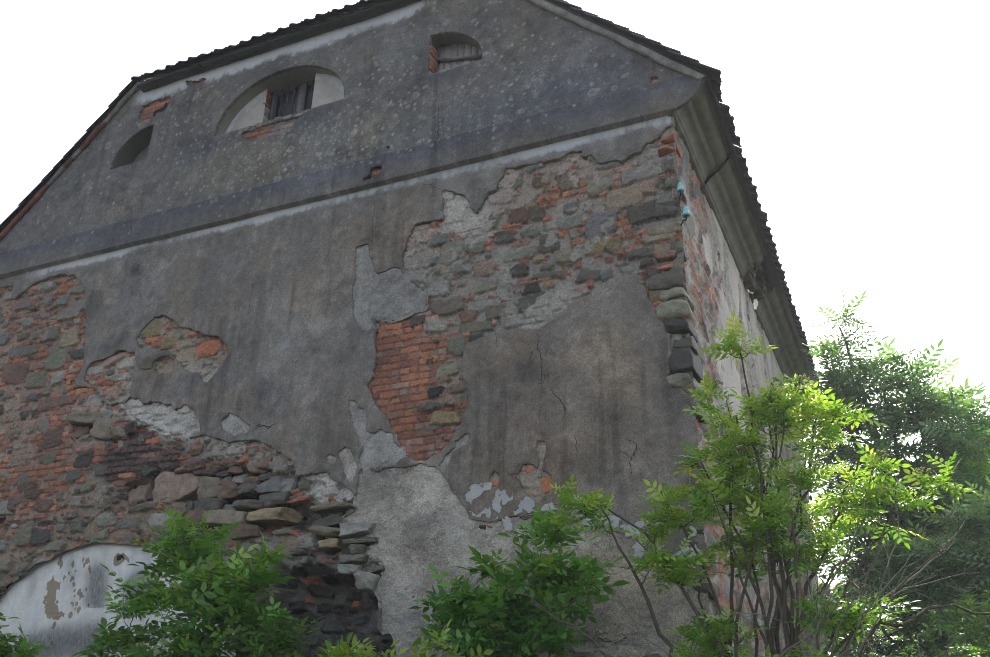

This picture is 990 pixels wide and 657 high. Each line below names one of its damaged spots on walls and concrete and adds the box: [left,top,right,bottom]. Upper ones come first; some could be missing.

spalling [140,98,171,122]
spalling [0,125,713,657]
crack [530,334,578,455]